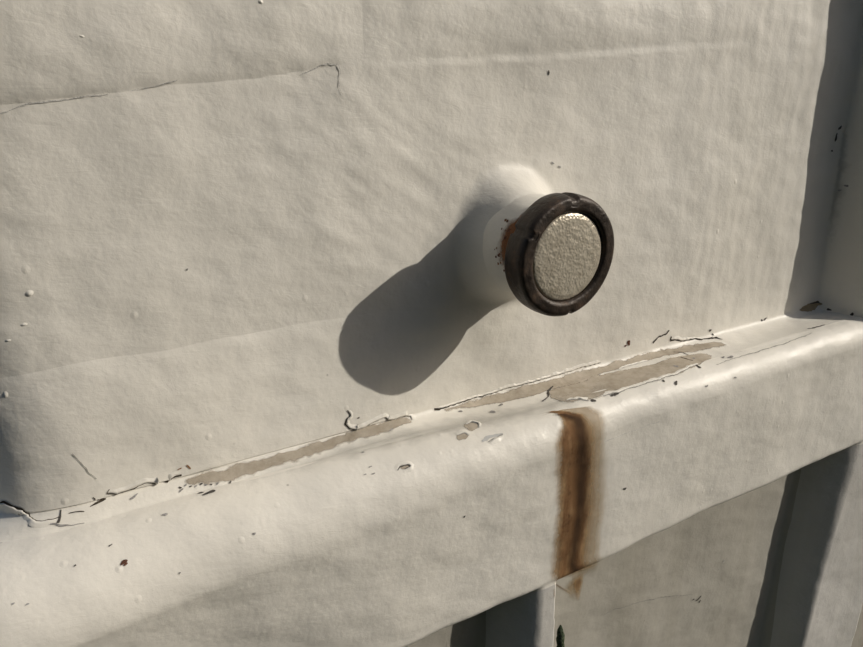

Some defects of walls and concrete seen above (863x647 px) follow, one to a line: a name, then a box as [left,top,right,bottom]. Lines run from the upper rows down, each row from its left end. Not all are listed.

corrosion [494,214,522,272]
peeling [800,301,831,312]
peeling [445,329,734,445]
peeling [179,417,414,495]
crack [0,465,191,528]
corrosion [548,407,601,593]